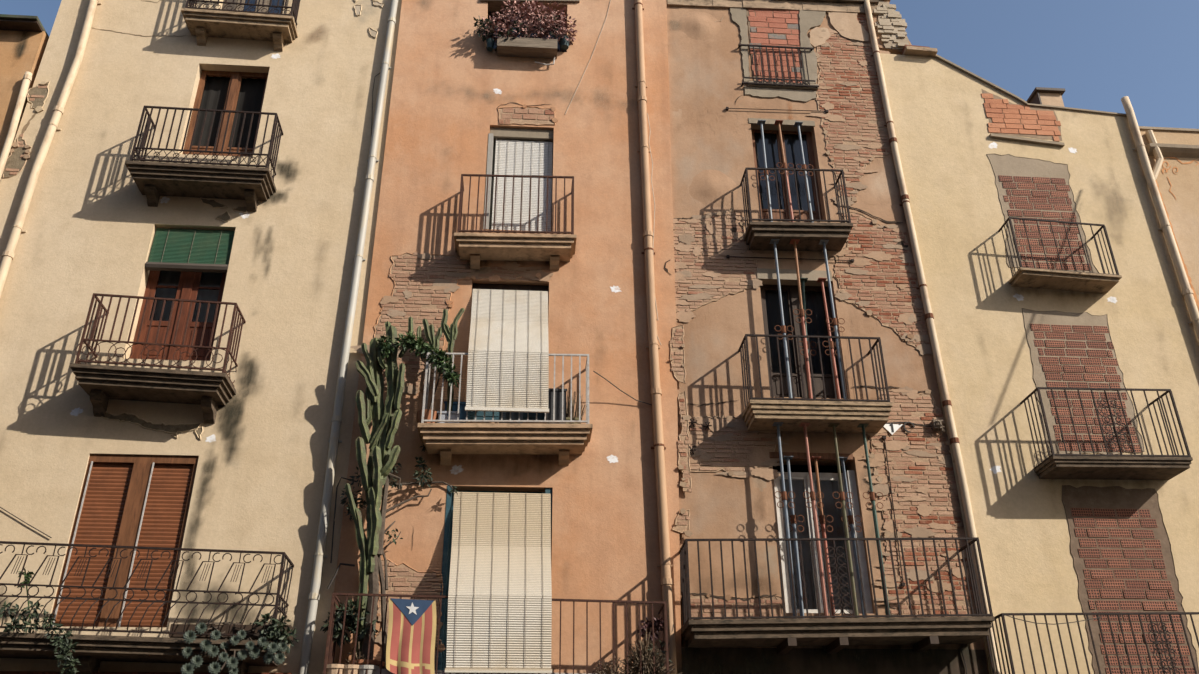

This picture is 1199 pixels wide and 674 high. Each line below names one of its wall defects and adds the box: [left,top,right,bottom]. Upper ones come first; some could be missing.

flaking render [3,134,31,178]
flaking render [27,81,50,113]
flaking render [497,104,558,126]
flaking render [807,14,933,355]
flaking render [350,252,554,395]
flaking render [669,208,788,492]
leakage [191,361,256,533]